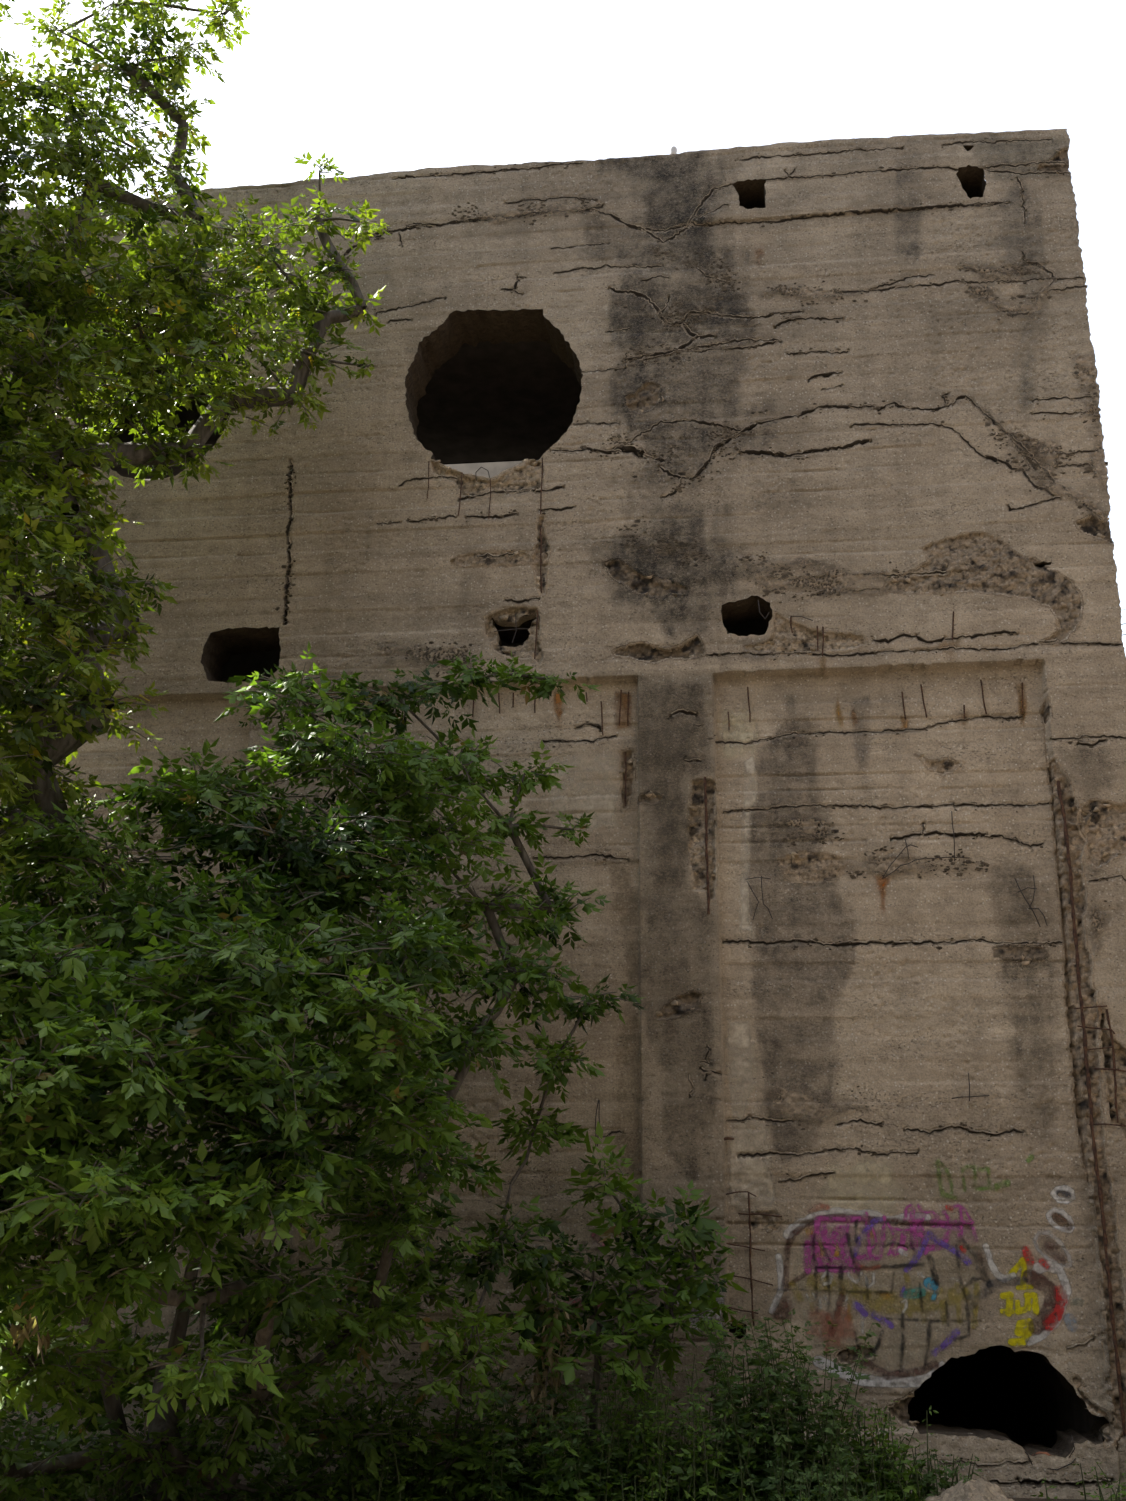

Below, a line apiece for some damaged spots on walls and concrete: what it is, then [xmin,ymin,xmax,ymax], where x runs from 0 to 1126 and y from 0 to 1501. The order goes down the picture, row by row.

damp [613,154,753,335]
damp [612,282,766,480]
crack [325,137,1108,560]
spalling [380,456,551,678]
crack [504,596,539,604]
damp [614,509,736,635]
crack [780,570,947,596]
spalling [734,531,1085,656]
spalling [618,747,667,817]
spalling [685,776,719,914]
damp [741,796,798,966]
spalling [992,682,1126,1449]